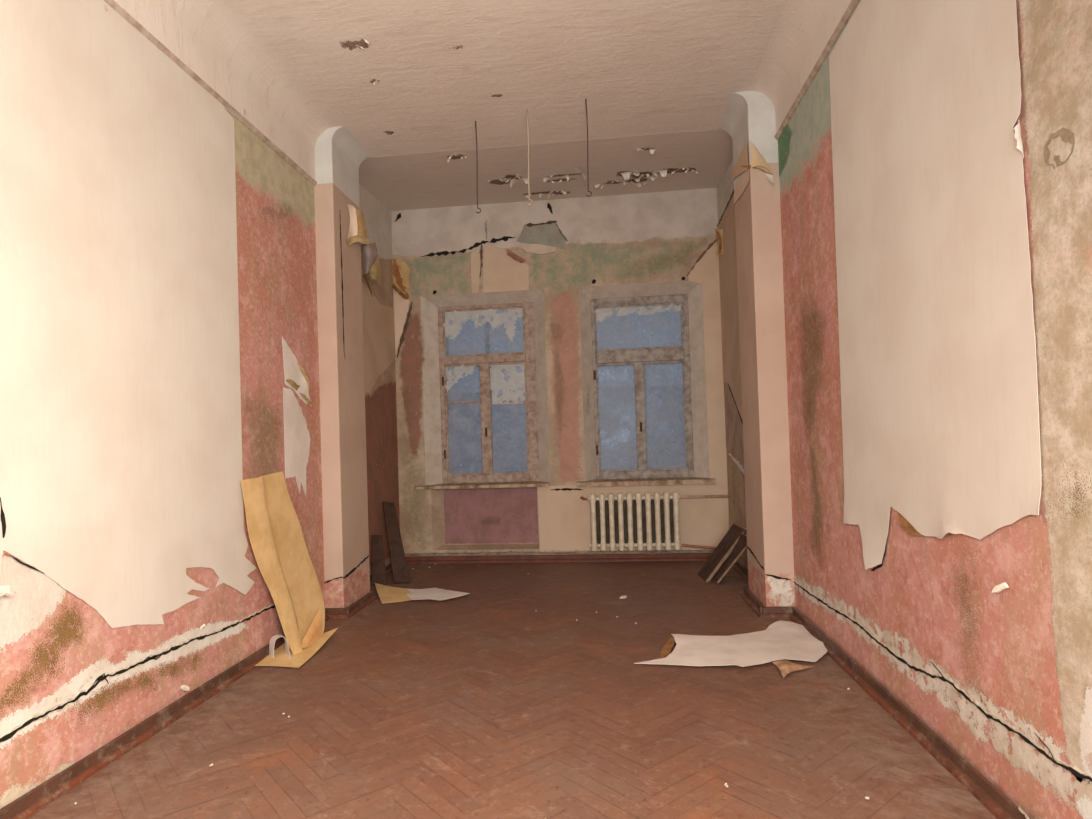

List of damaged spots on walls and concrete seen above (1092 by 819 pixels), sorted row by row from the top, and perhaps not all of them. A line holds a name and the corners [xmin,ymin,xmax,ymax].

crack [421,221,516,257]
spalling [516,221,568,255]
peeling [282,337,312,496]
peeling [398,312,425,459]
leakage [798,293,827,566]
spalling [0,556,67,653]
leakage [0,595,94,718]
spalling [0,620,249,749]
crack [0,603,276,744]
crack [747,546,1092,782]
spalling [766,573,1092,819]
spalling [0,760,74,809]